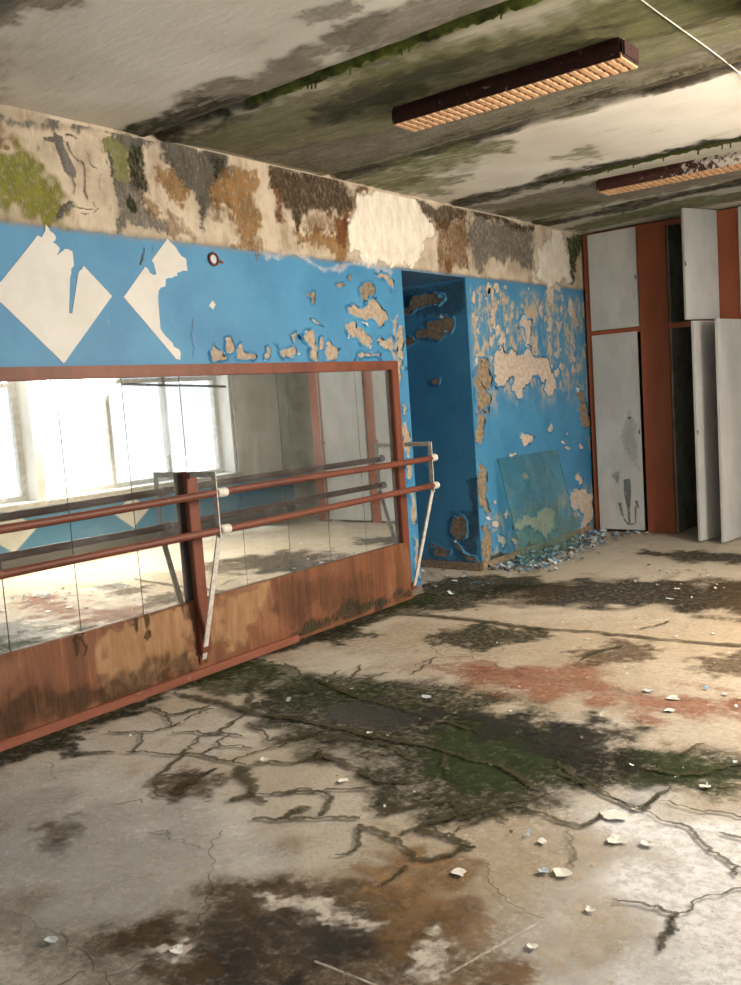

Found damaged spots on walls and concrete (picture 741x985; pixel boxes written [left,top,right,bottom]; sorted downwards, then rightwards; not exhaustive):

damp [0,0,83,26]
flaking render [43,132,76,177]
damp [103,0,741,291]
peeling [208,289,341,364]
peeling [335,270,456,386]
peeling [471,282,576,448]
peeling [401,401,559,581]
peeling [567,470,594,530]
damp [492,578,741,622]
crack [50,613,741,951]
damp [460,710,651,782]
damp [98,774,741,985]